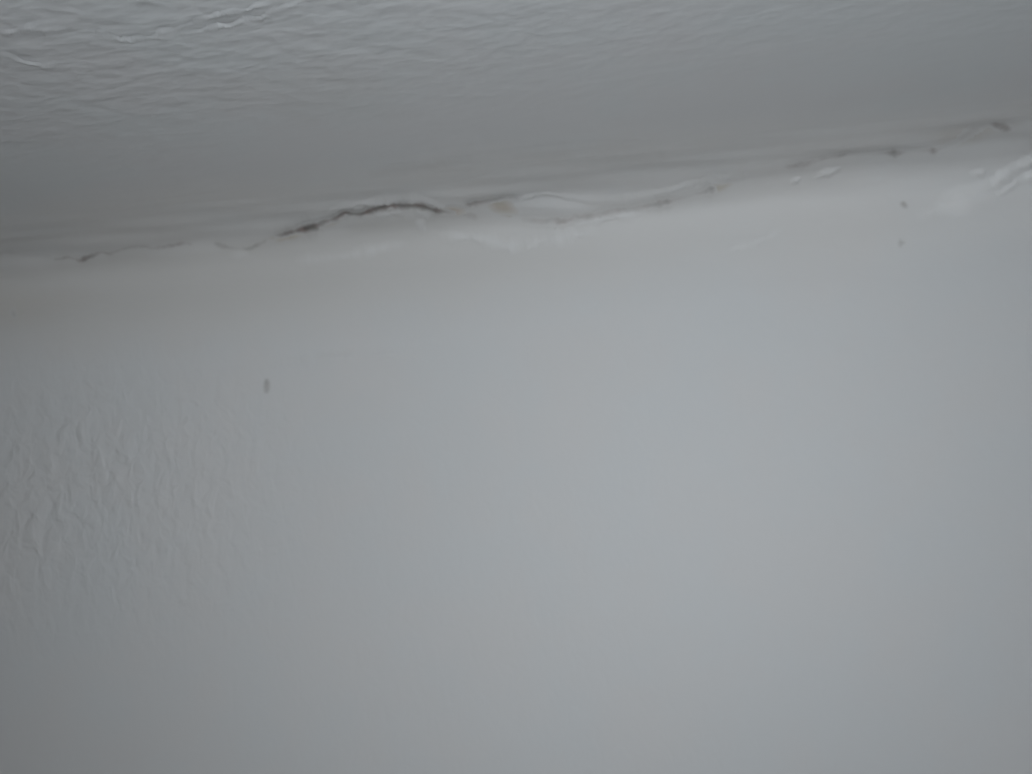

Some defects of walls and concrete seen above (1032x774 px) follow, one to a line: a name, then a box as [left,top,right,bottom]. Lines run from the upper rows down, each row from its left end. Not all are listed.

crack [783,119,1013,172]
crack [213,182,735,252]